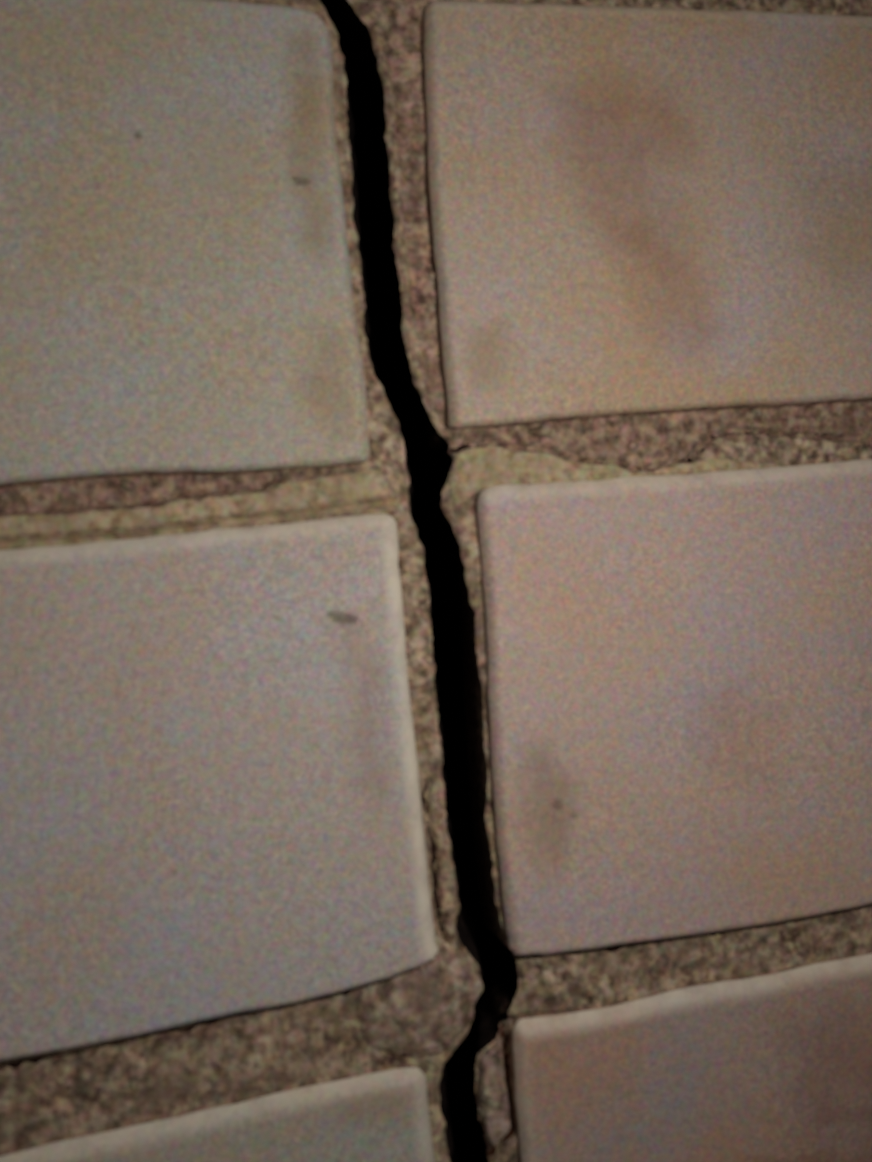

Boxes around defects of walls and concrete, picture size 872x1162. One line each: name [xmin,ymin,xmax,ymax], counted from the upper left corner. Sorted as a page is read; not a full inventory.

crack [563,427,856,471]
crack [319,0,531,1162]
crack [566,931,725,955]